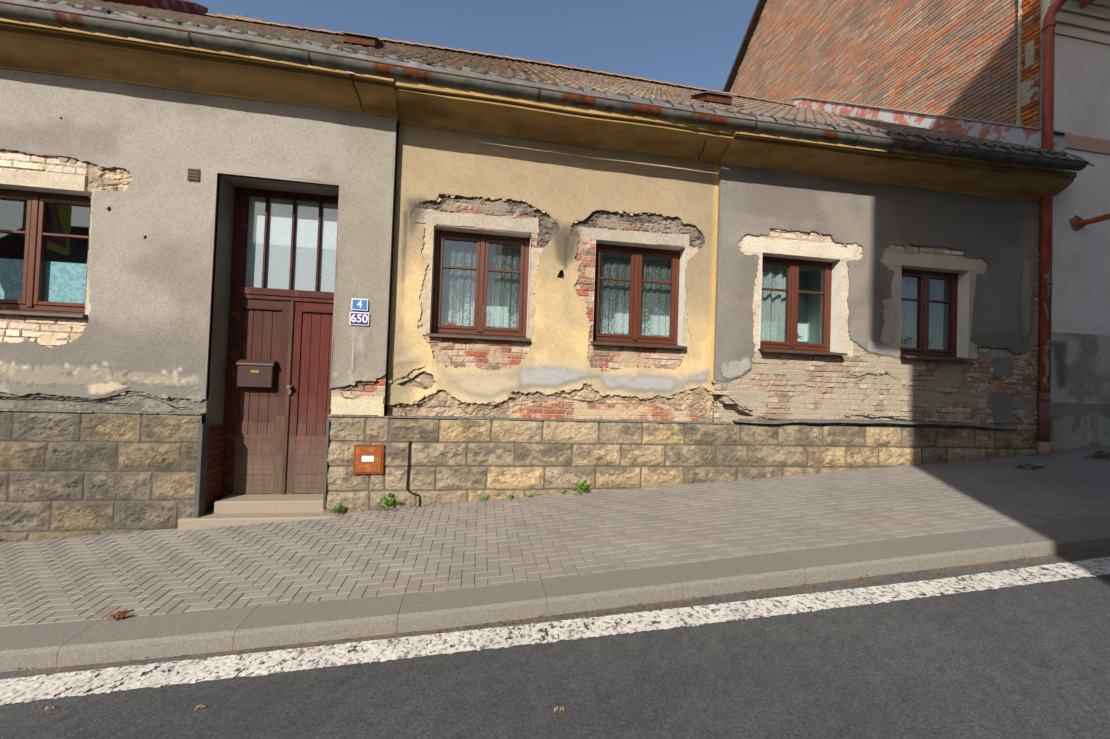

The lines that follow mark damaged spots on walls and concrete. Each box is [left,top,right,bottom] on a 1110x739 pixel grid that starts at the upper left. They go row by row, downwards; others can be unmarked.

flaking render [1016,0,1041,130]
flaking render [0,150,132,254]
flaking render [0,269,91,348]
flaking render [330,194,1052,430]
crack [0,393,202,409]